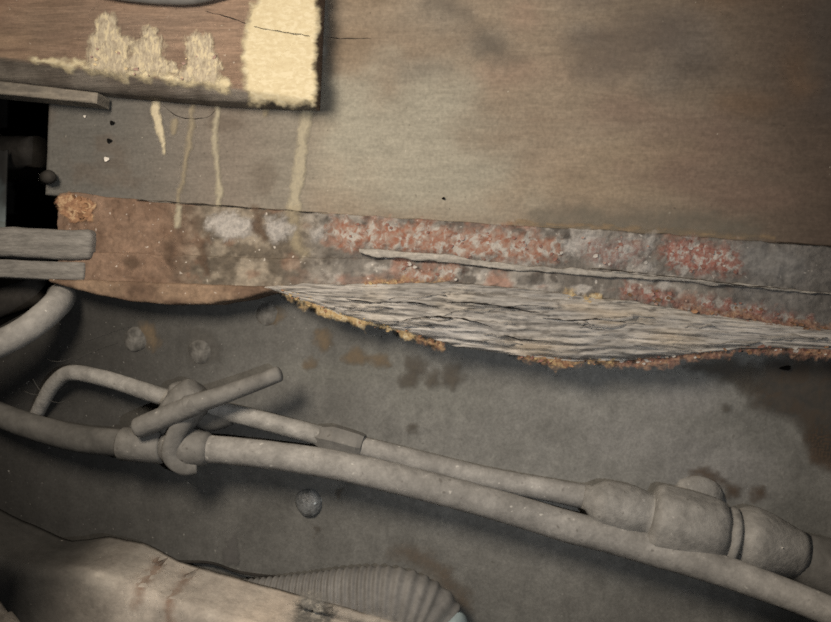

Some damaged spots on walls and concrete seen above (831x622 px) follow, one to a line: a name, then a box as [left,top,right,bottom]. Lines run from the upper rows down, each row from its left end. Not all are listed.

leakage [151,101,177,153]
leakage [175,104,195,228]
leakage [211,106,223,207]
leakage [288,111,312,258]
crack [348,299,627,341]
peeling [620,283,793,323]
corrosion [679,304,831,331]